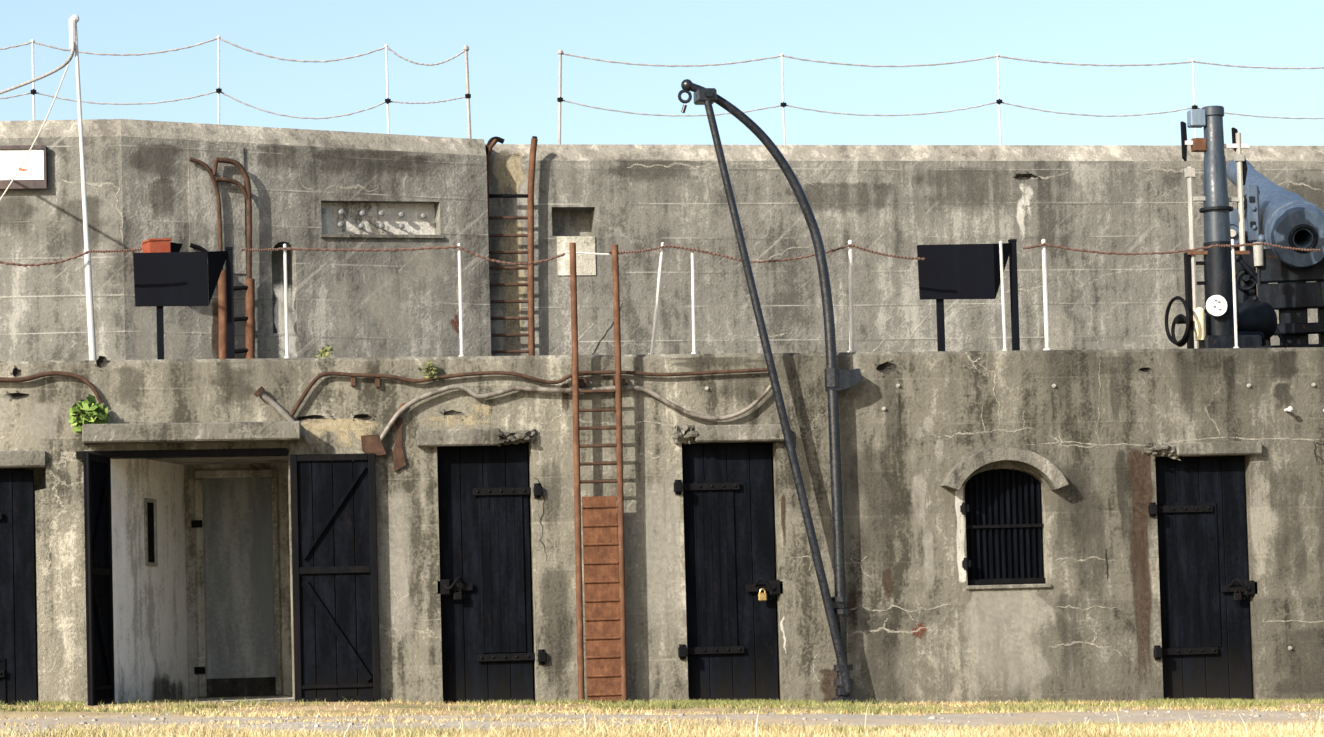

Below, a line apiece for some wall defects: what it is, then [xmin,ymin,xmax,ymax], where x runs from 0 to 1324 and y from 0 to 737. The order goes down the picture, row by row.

damp [274,286,298,358]
crack [851,556,951,634]
crack [1055,550,1109,610]
corrosion [1128,450,1153,670]